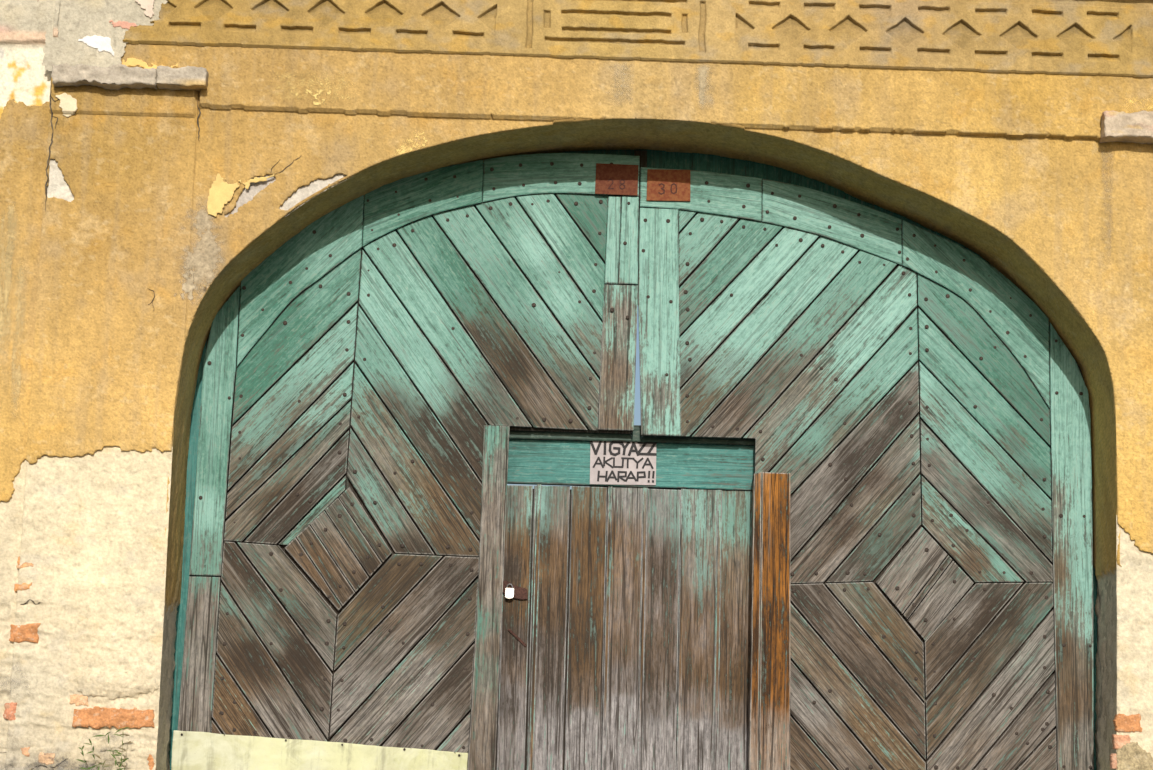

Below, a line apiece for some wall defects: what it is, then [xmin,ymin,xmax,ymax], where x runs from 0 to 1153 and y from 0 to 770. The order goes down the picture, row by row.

spalling [0,0,178,119]
spalling [46,159,74,202]
spalling [207,173,276,217]
spalling [280,174,347,217]
spalling [0,446,173,770]
spalling [1110,515,1153,770]
damp [1116,742,1153,770]